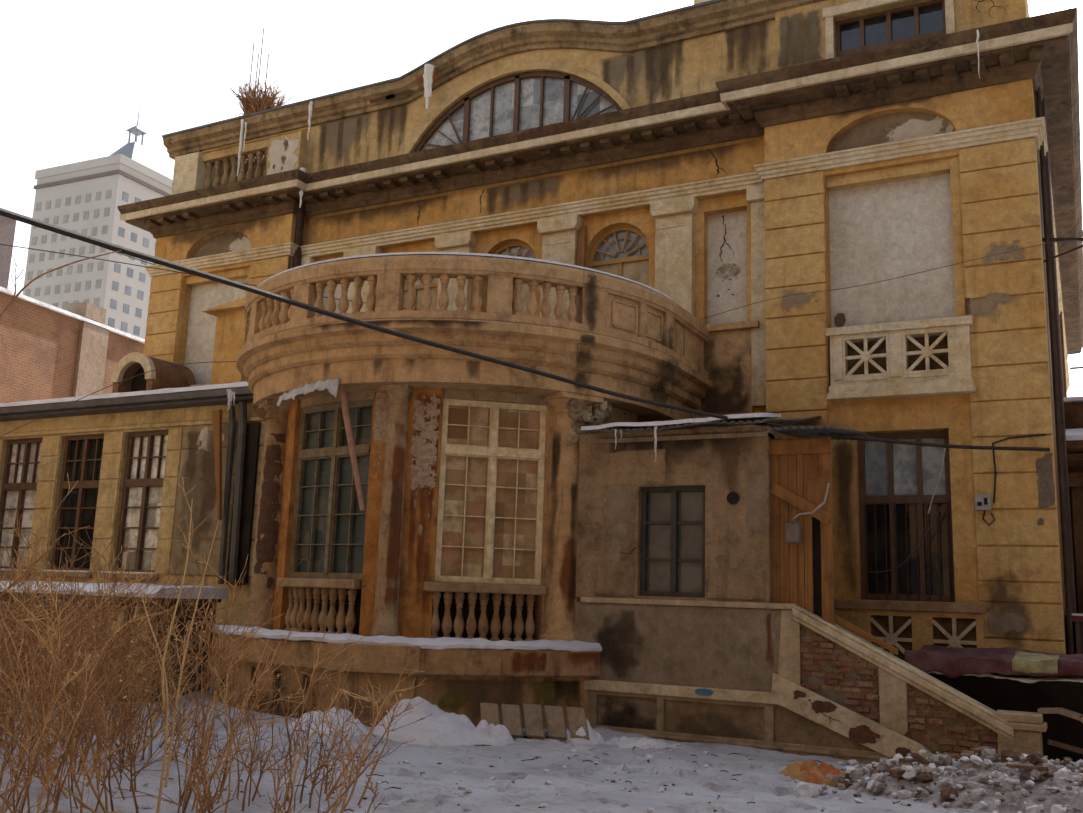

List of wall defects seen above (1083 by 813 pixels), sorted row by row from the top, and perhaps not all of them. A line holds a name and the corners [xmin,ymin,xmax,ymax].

leakage [603,41,682,102]
leakage [726,22,767,66]
leakage [779,11,821,67]
leakage [309,102,406,160]
peeling [886,116,954,143]
crack [719,215,734,261]
peeling [409,392,441,535]
corrosion [385,398,440,604]
leakage [991,579,1027,643]
leakage [597,612,635,671]
spalling [793,690,837,714]
spalling [848,725,880,744]